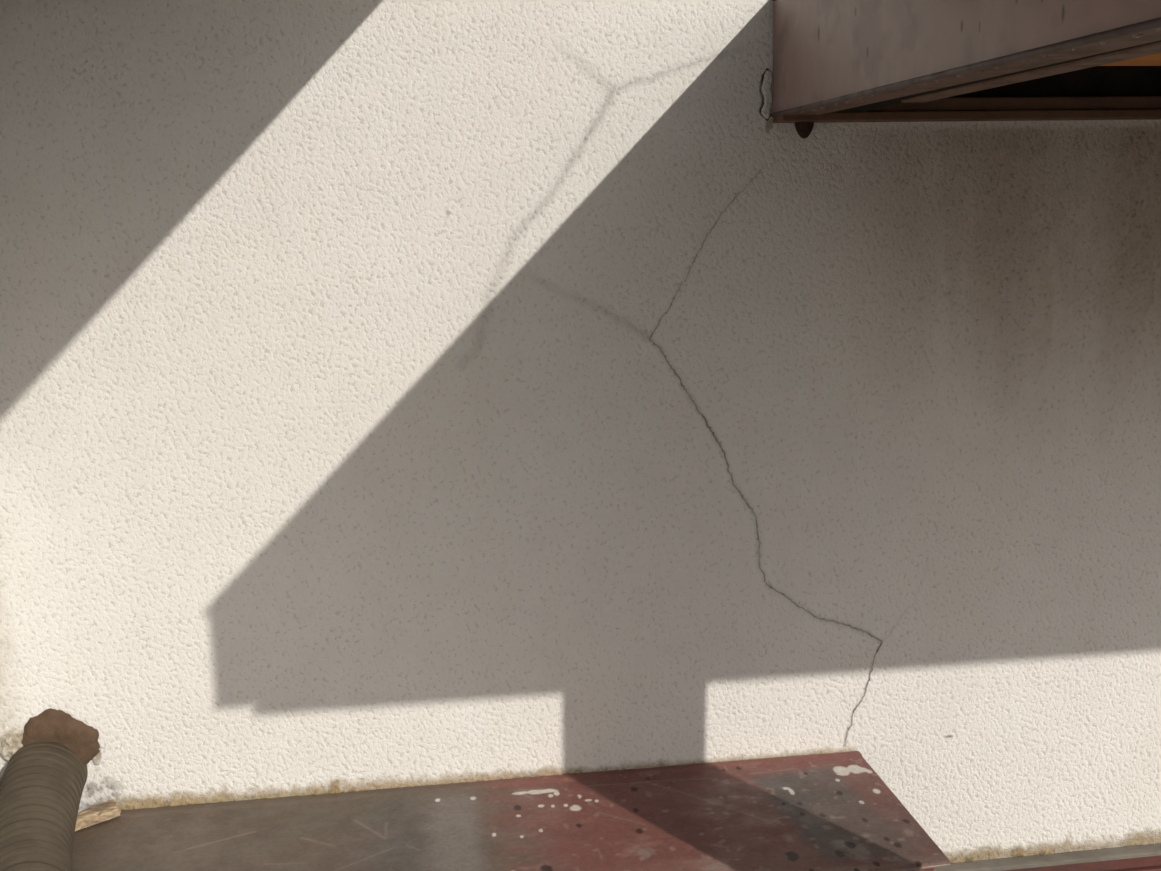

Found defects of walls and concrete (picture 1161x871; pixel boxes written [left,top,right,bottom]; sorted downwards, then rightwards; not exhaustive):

crack [650,337,785,596]
crack [845,625,882,739]